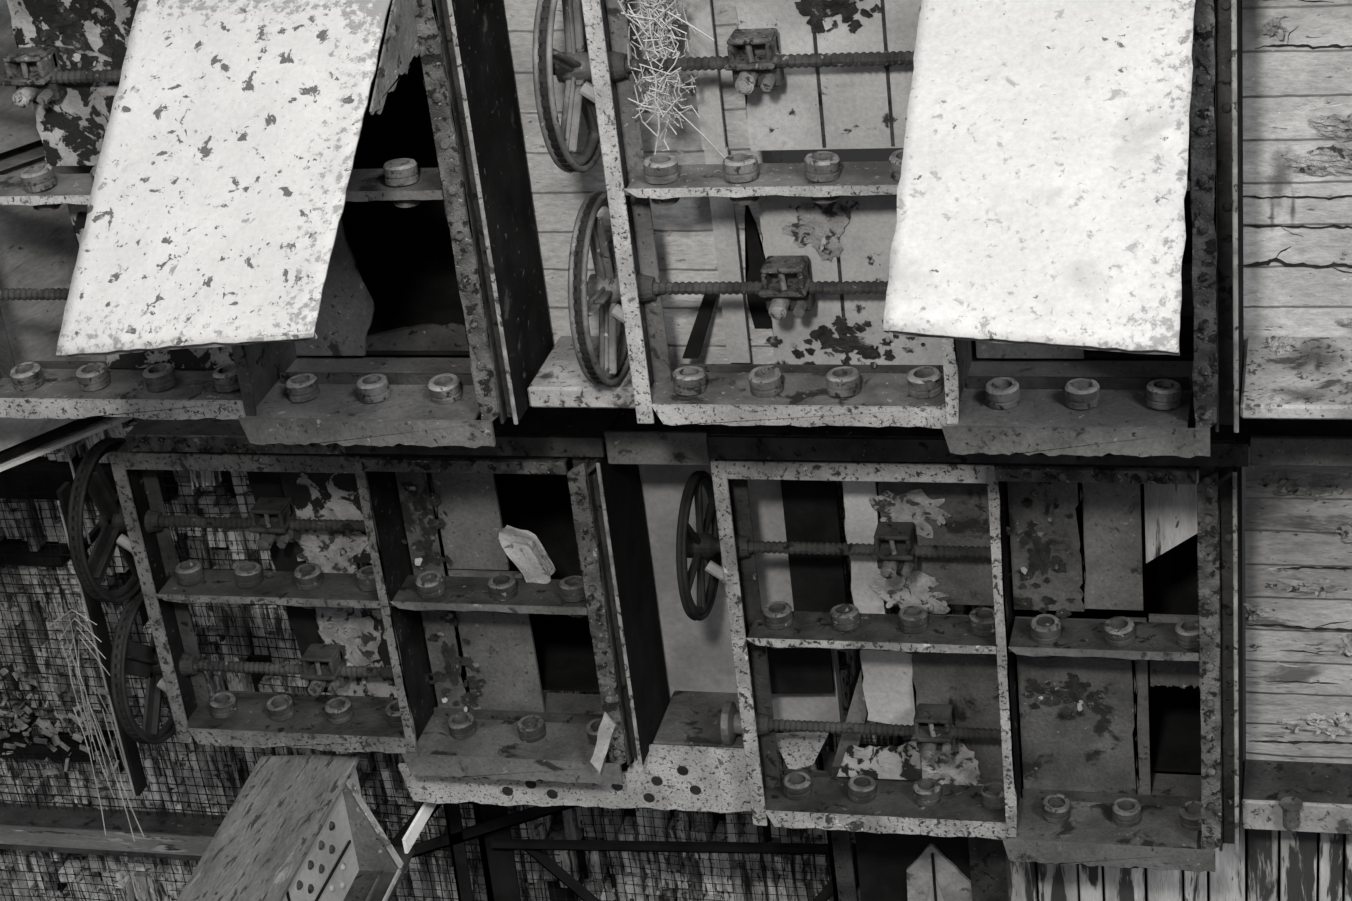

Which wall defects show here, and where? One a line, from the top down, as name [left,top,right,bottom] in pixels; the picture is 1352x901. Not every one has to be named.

peeling [29,0,114,67]
peeling [794,0,882,34]